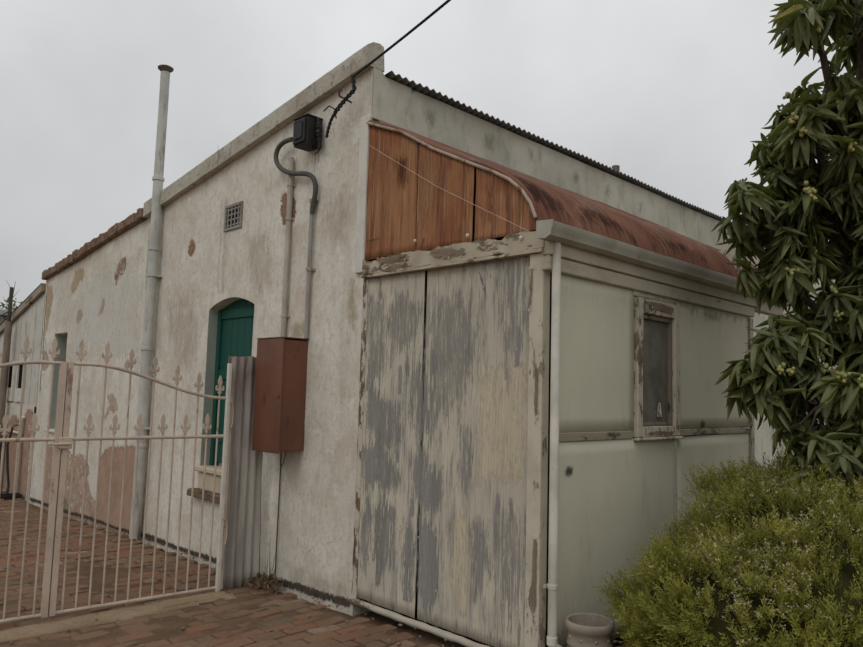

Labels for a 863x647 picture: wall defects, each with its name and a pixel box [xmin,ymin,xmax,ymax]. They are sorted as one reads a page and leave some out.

spalling [279,193,296,226]
rust [515,176,569,216]
spalling [114,257,126,285]
peeling [358,256,534,628]
spalling [43,444,144,541]
peeling [466,493,537,646]